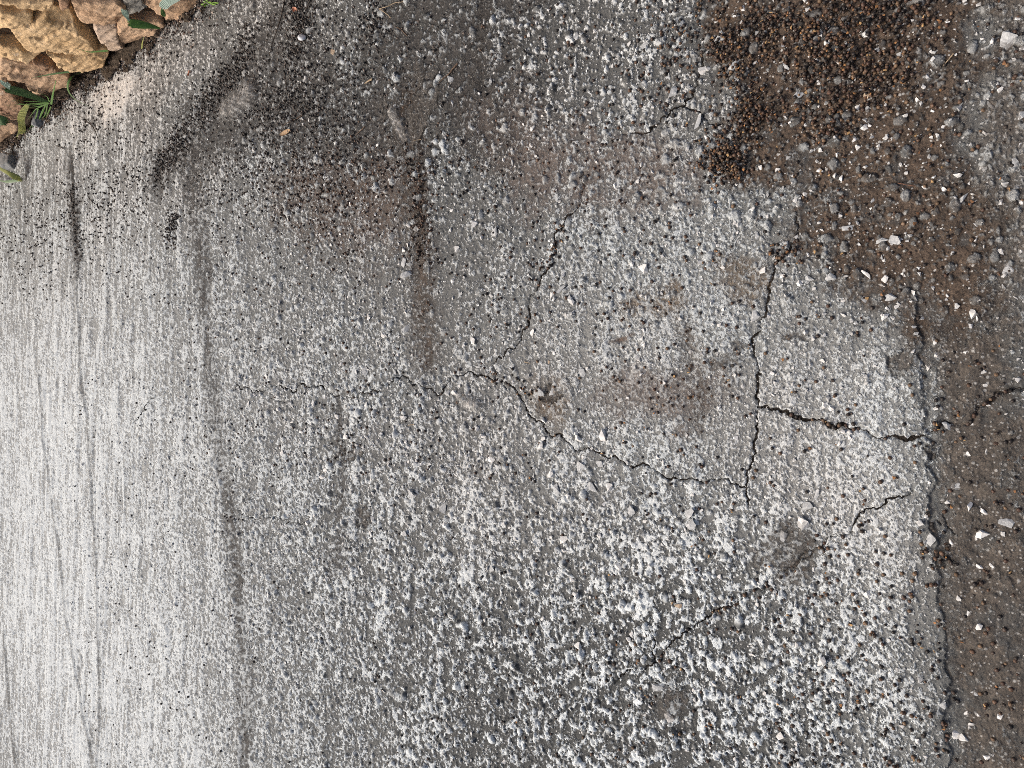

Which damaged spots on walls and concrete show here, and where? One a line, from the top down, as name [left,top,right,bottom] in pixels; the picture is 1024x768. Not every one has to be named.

crack [235,172,1024,505]
crack [617,493,911,681]